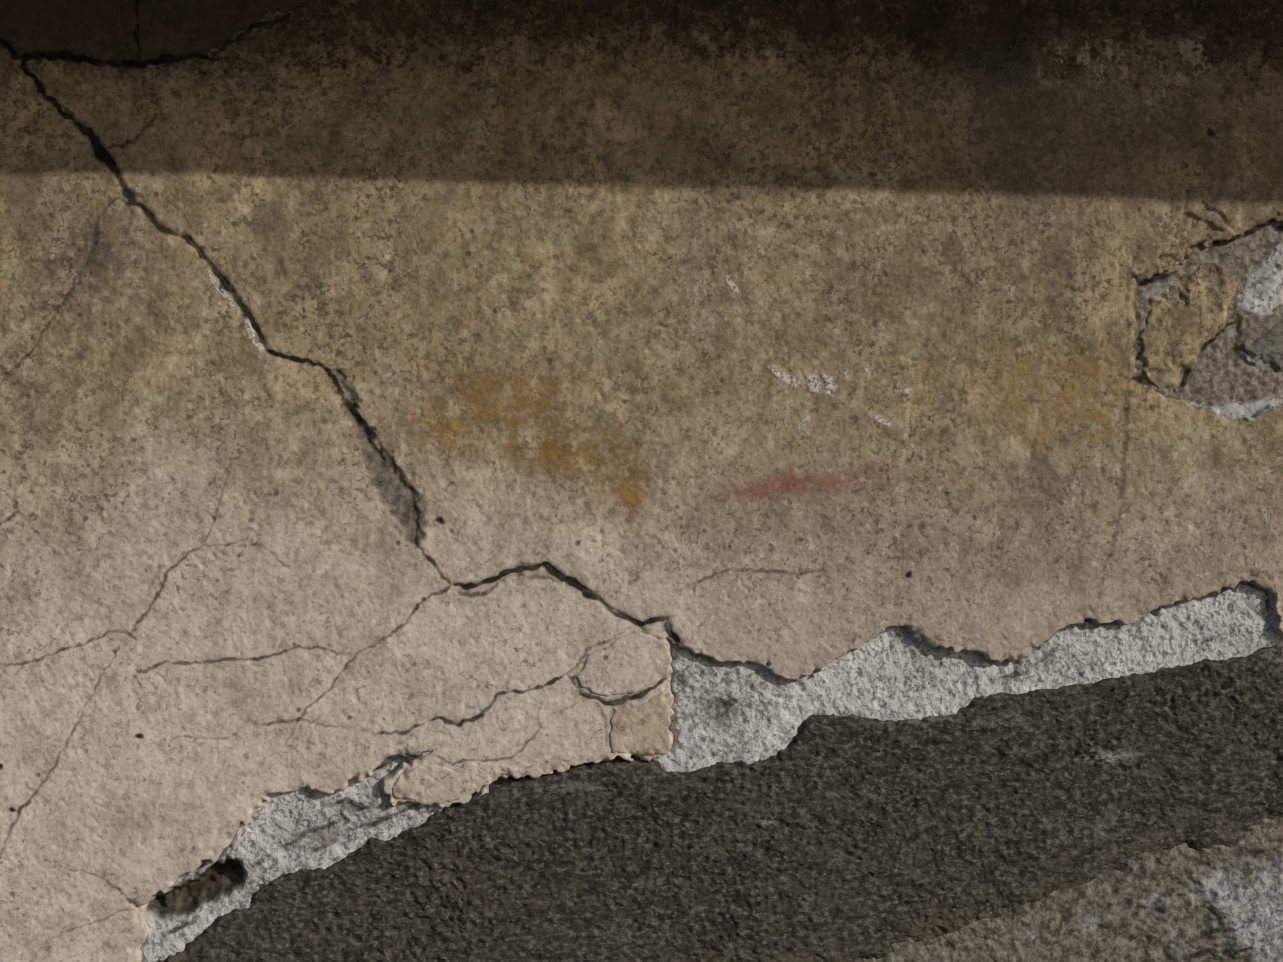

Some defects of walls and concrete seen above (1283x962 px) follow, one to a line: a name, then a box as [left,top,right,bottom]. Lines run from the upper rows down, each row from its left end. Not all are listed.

water stain [184,0,1283,199]
crack [0,0,680,644]
spalling [1130,221,1283,421]
crack [18,800,31,816]
crack [22,556,187,665]
crack [143,645,351,671]
spalling [140,722,518,962]
crack [377,677,666,769]
spalling [573,582,1283,772]
spalling [848,817,1283,962]